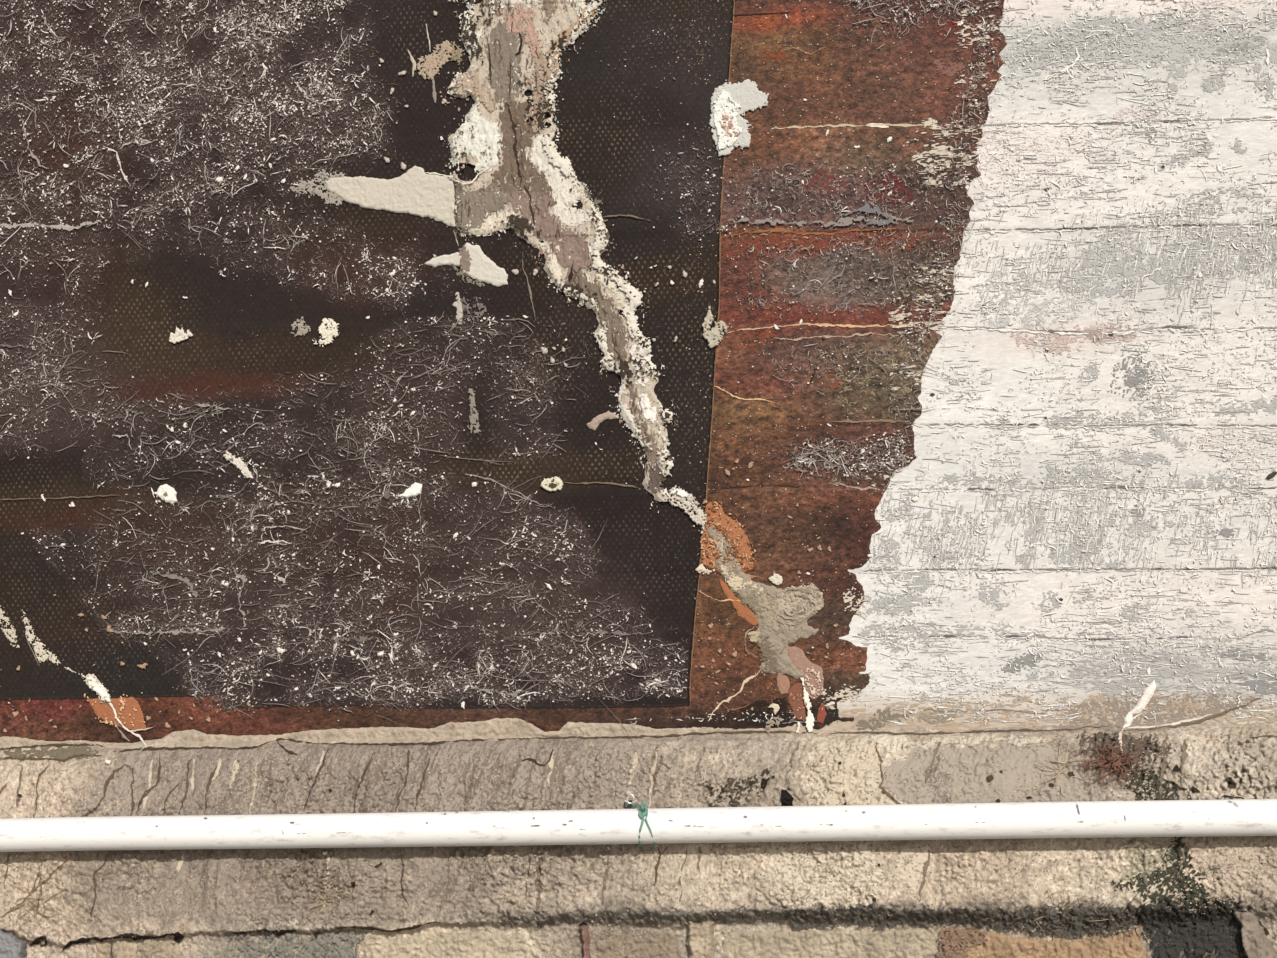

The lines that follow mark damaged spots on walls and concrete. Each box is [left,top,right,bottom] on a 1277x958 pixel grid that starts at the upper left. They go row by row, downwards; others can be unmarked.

spalling [457,0,497,28]
hole [513,73,557,136]
corrosion [720,114,739,136]
corrosion [1008,320,1137,355]
peeling [700,502,759,625]
peeling [777,646,827,723]
crack [0,669,1261,817]
damp [1075,731,1188,800]